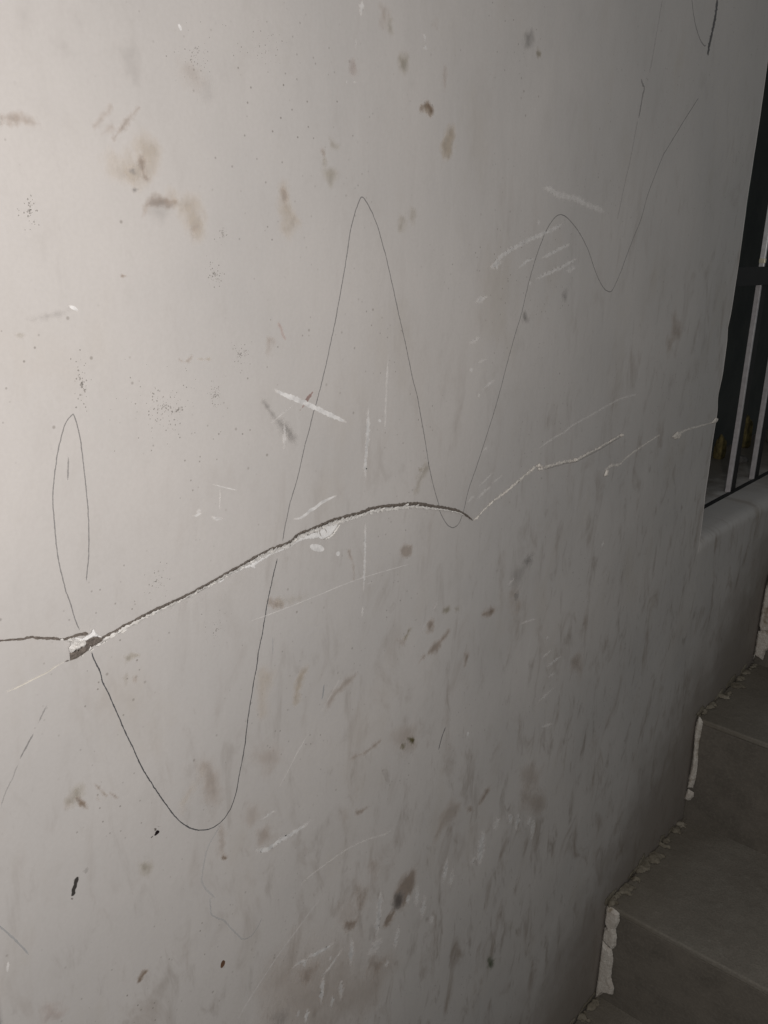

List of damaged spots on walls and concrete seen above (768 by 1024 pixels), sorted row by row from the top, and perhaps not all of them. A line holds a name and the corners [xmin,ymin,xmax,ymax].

crack [0,418,718,691]
peeling [685,717,703,800]
peeling [595,906,620,997]